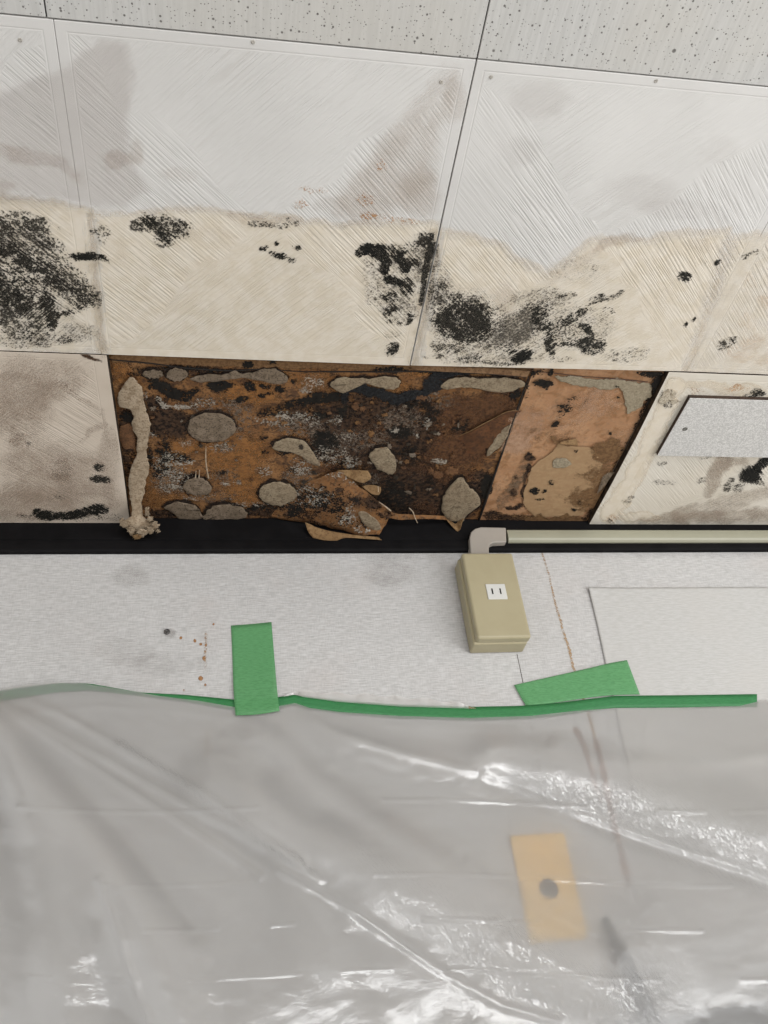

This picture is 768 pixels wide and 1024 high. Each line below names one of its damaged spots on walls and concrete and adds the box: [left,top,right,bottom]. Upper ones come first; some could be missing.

flaking render [117,377,164,540]
water stain [0,188,768,533]
peeling [387,404,460,469]